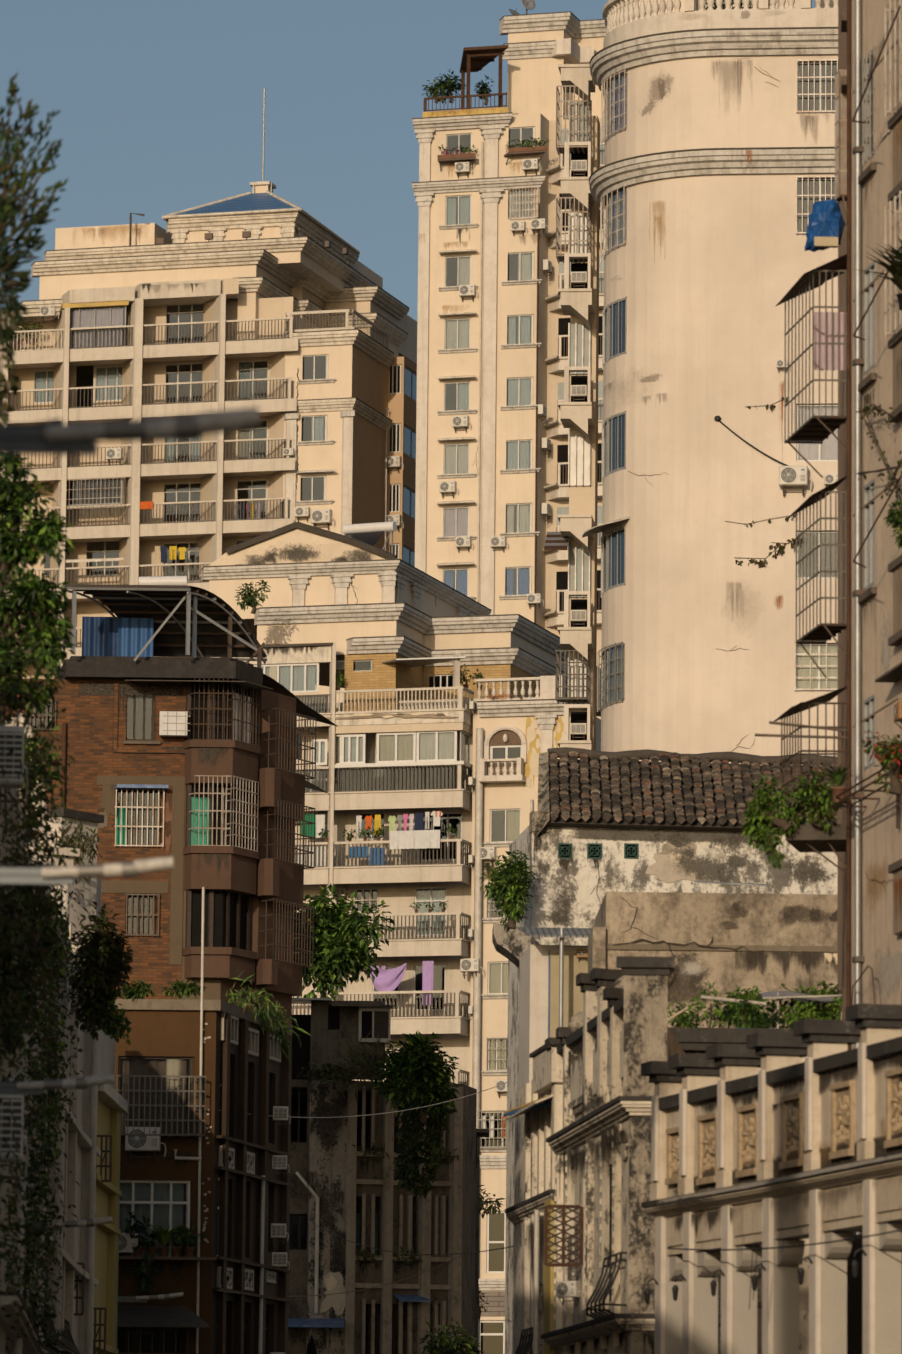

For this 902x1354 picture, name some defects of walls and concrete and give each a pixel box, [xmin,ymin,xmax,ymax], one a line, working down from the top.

damp [534,831,572,874]
damp [570,828,754,882]
damp [785,858,832,883]
damp [546,890,574,926]
crack [592,861,761,956]
damp [722,901,748,929]
damp [780,906,837,925]
damp [316,1091,348,1156]
damp [290,1169,413,1275]